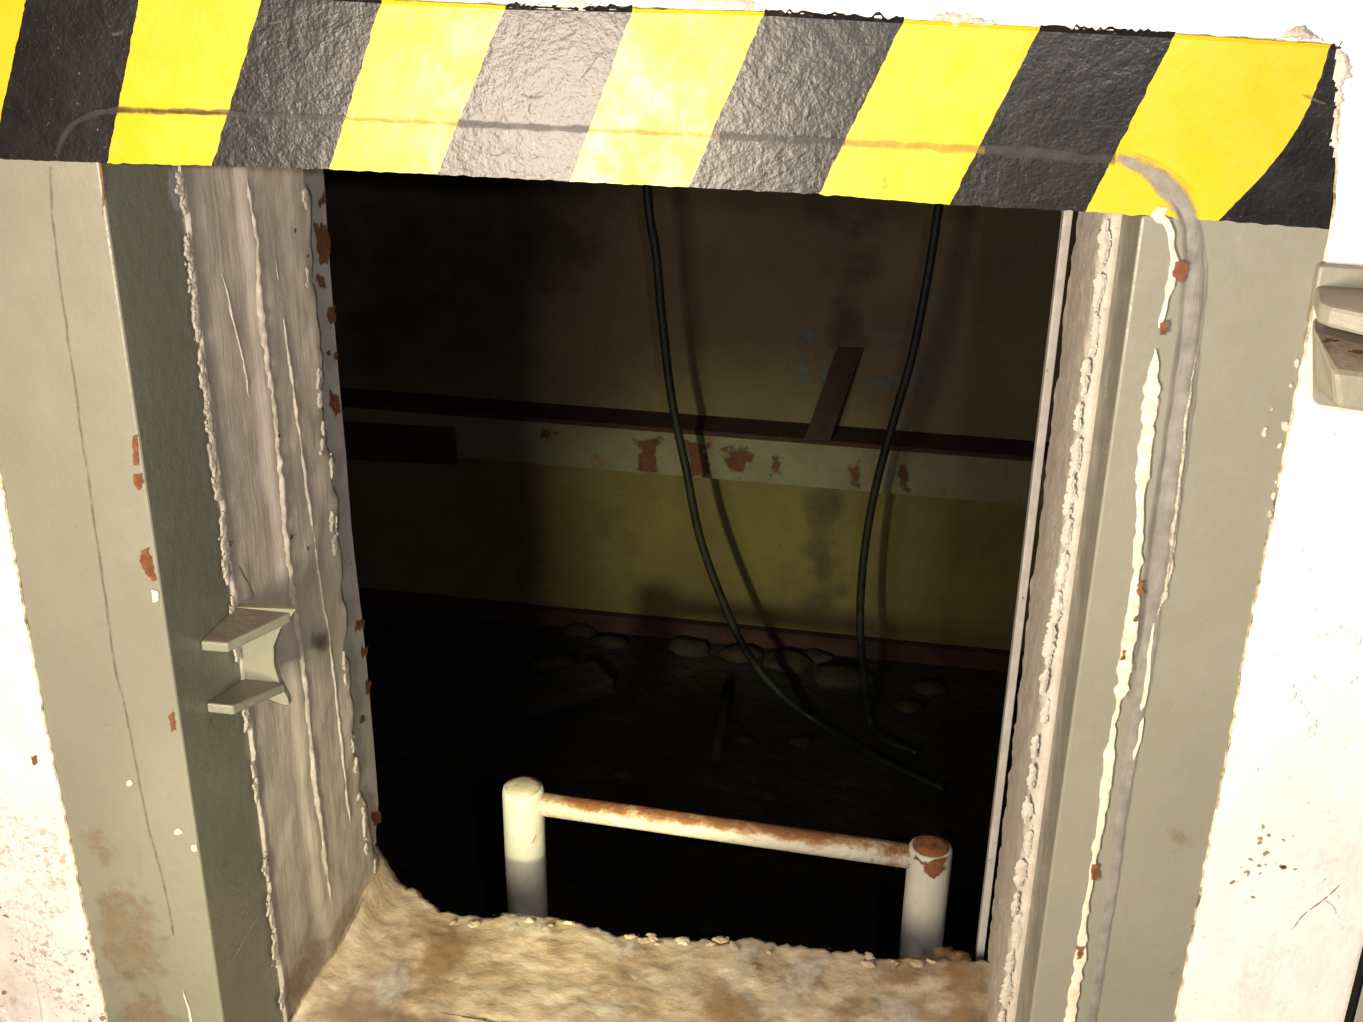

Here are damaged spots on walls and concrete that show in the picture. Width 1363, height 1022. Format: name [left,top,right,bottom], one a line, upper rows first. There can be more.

corrosion [313,191,331,288]
corrosion [327,305,336,324]
spalling [174,165,237,614]
spalling [316,365,335,479]
corrosion [329,389,341,417]
corrosion [637,438,660,473]
corrosion [684,440,754,477]
peeling [997,220,1111,1022]
peeling [1063,155,1205,1022]
spalling [250,761,262,816]
spalling [261,842,280,968]
crack [439,1012,492,1022]